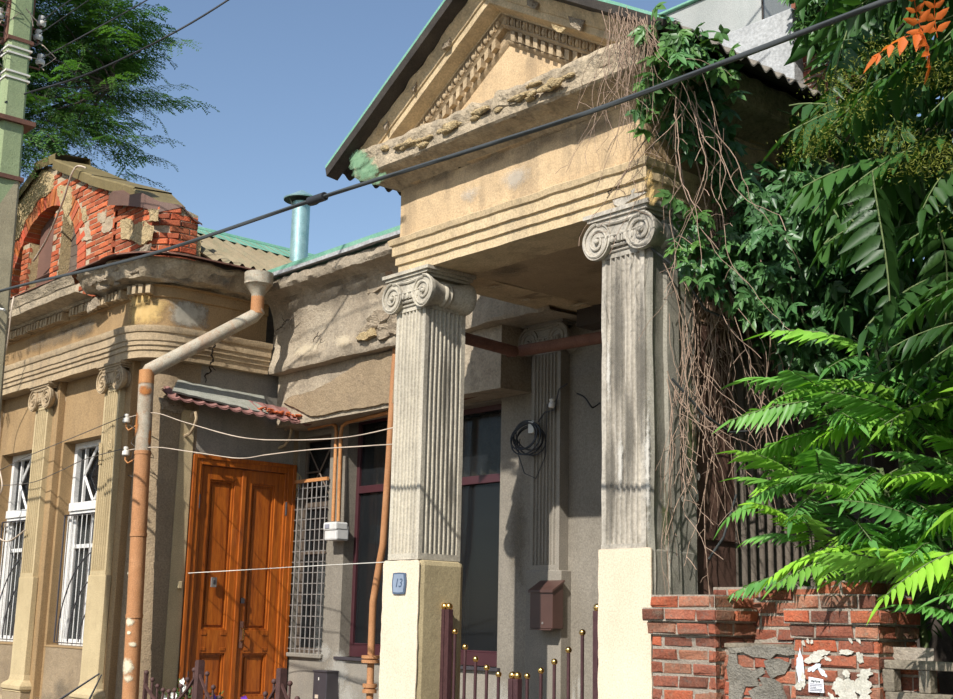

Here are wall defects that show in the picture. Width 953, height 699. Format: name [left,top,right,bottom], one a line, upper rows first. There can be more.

peeling [15,170,159,251]
spalling [86,266,138,314]
crack [204,344,216,383]
peeling [284,310,397,417]
peeling [727,645,795,699]
peeling [831,668,873,699]